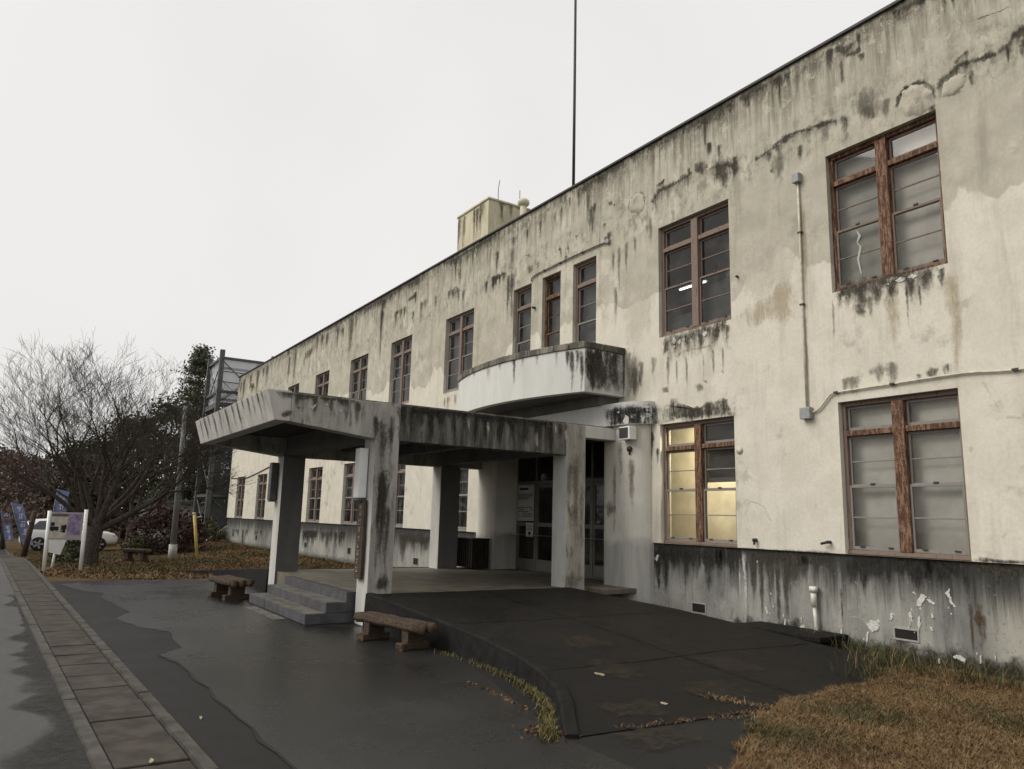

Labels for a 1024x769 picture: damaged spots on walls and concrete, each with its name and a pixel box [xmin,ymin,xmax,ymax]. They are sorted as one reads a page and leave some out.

leakage [826,34,863,81]
leakage [859,93,889,116]
leakage [837,268,944,313]
leakage [566,350,654,392]
leakage [374,398,567,454]
leakage [606,388,732,461]
leakage [302,530,345,545]
leakage [376,474,429,588]
leakage [655,546,831,621]
leakage [847,556,1024,590]
peeling [863,612,895,642]